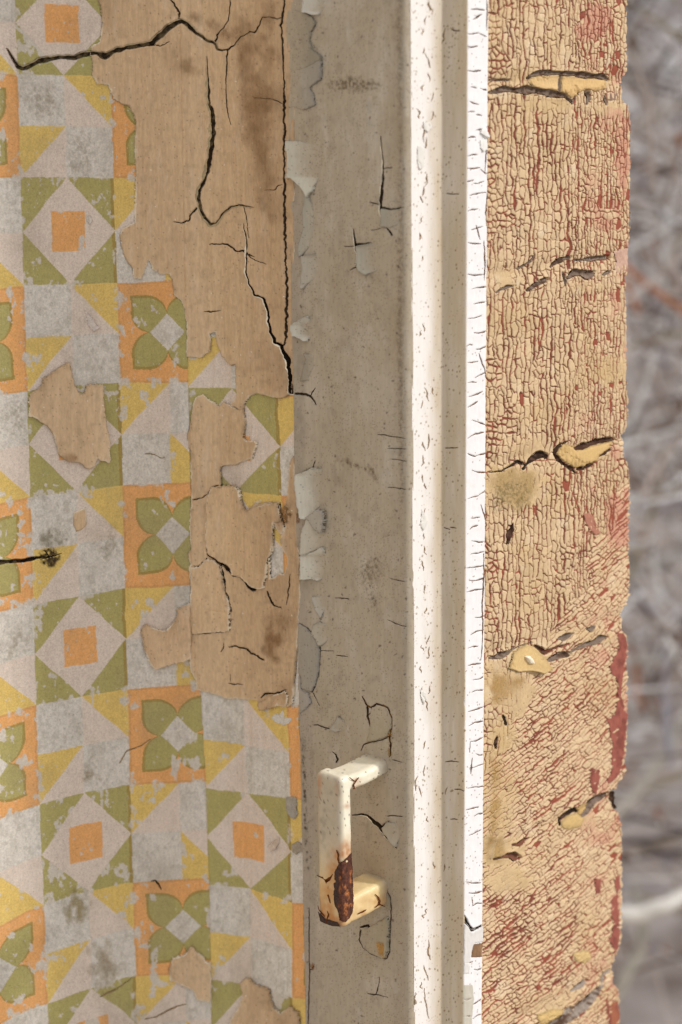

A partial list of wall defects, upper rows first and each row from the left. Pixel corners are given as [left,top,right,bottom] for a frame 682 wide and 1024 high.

peeling [527,75,618,101]
crack [7,0,316,405]
peeling [90,0,329,720]
peeling [28,362,111,469]
crack [192,1,488,849]
peeling [556,441,612,468]
crack [0,550,62,564]
peeling [508,643,553,674]
peeling [561,632,628,829]
peeling [609,875,620,953]
peeling [230,977,302,1024]
peeling [605,1001,620,1024]